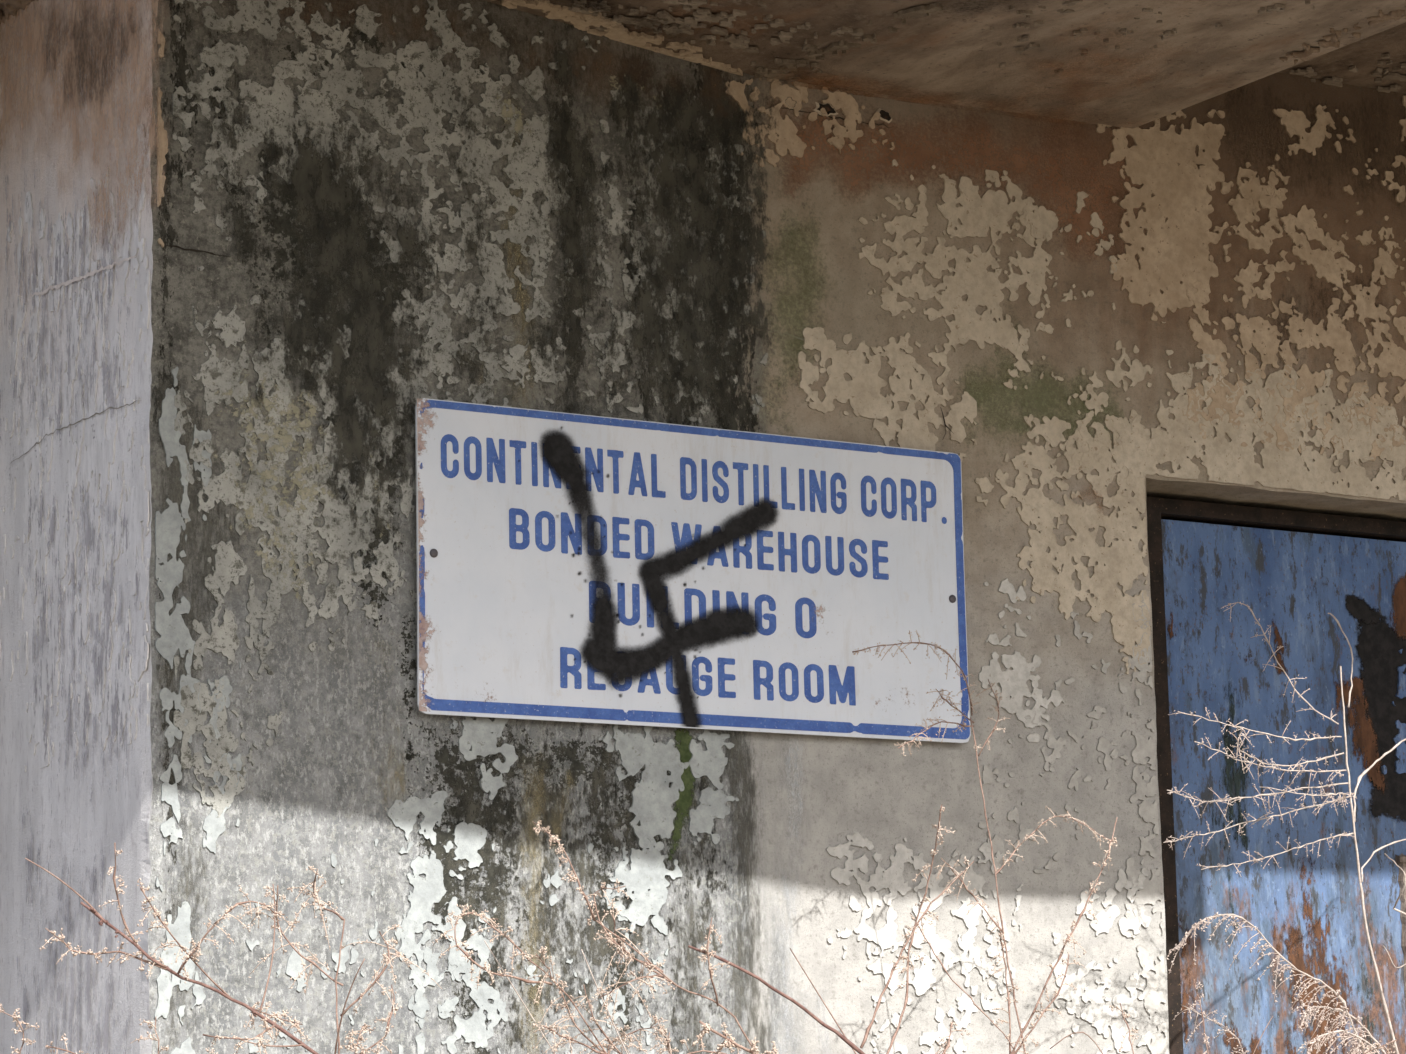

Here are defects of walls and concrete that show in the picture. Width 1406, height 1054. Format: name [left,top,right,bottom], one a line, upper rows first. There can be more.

water stain [509,25,1136,435]
peeling [0,0,898,855]
water stain [151,0,770,1054]
peeling [797,0,1406,1054]
corrosion [1271,619,1288,675]
corrosion [1334,676,1385,794]
corrosion [1390,574,1406,638]
peeling [154,901,206,1054]
peeling [540,871,562,906]
peeling [597,724,739,1054]
corrosion [1223,1021,1263,1054]
corrosion [1273,857,1357,1054]